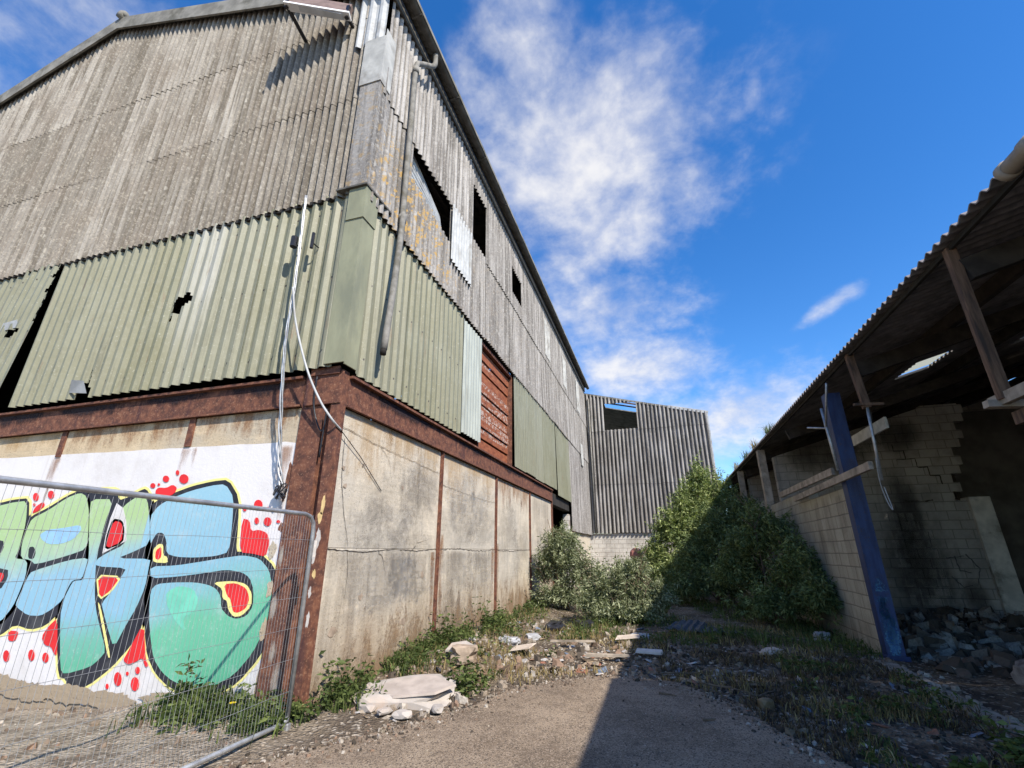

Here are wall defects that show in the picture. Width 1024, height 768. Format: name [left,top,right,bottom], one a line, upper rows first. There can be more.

corrosion [282,447,292,502]
peeling [308,495,325,598]